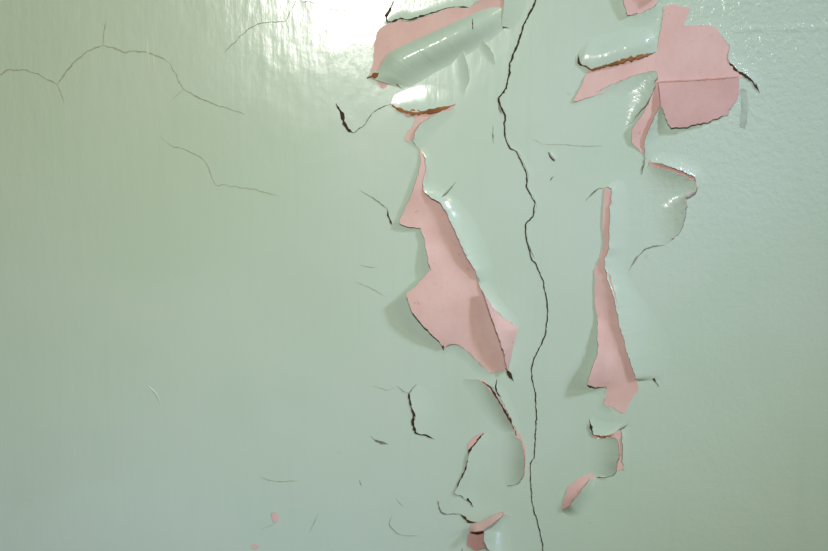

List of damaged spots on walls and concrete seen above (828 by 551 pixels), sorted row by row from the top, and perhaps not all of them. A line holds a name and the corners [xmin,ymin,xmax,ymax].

crack [0,21,243,114]
crack [227,0,355,49]
crack [164,140,278,196]
peeling [336,0,527,507]
crack [492,0,589,551]
peeling [561,0,765,517]
peeling [438,502,515,551]